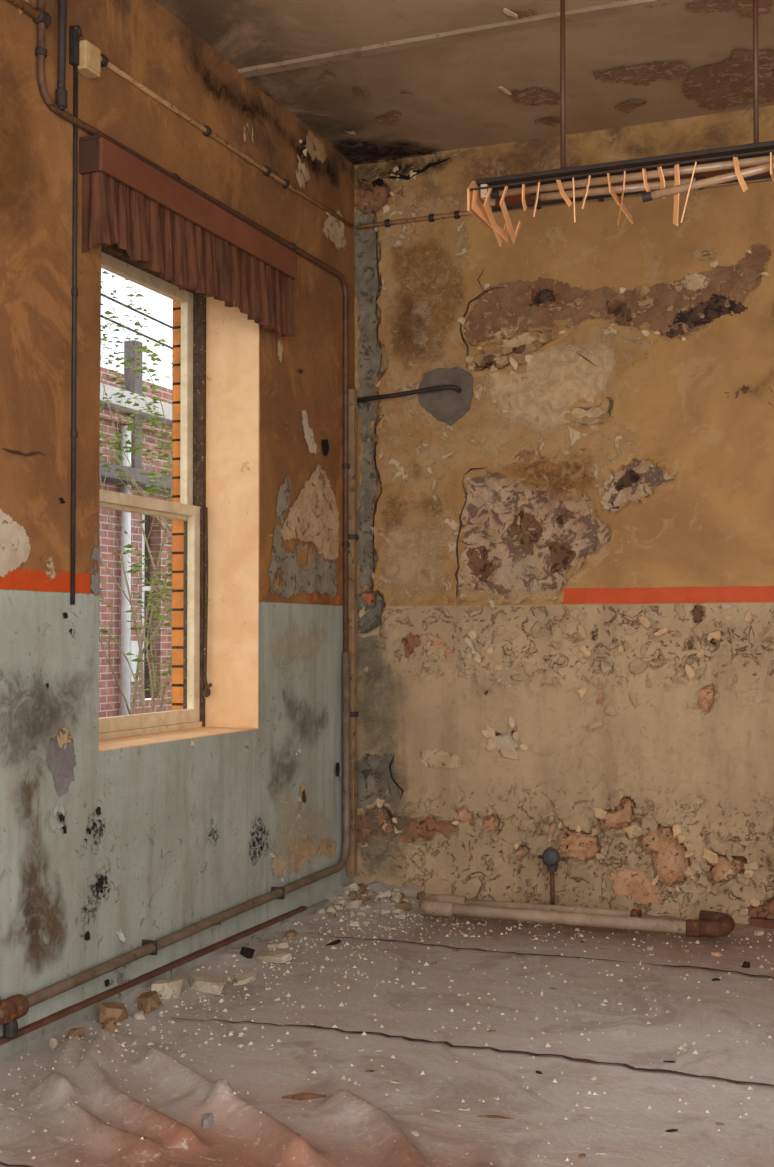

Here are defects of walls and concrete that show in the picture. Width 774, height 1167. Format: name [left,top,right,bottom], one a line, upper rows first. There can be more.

leakage [297,141,338,184]
peeling [295,129,348,189]
flaking render [322,179,772,633]
corrosion [22,779,37,817]
leakage [85,807,104,848]
flaking render [548,789,774,918]
corrosion [22,835,63,969]
leakage [82,868,109,941]
crack [171,1017,774,1086]